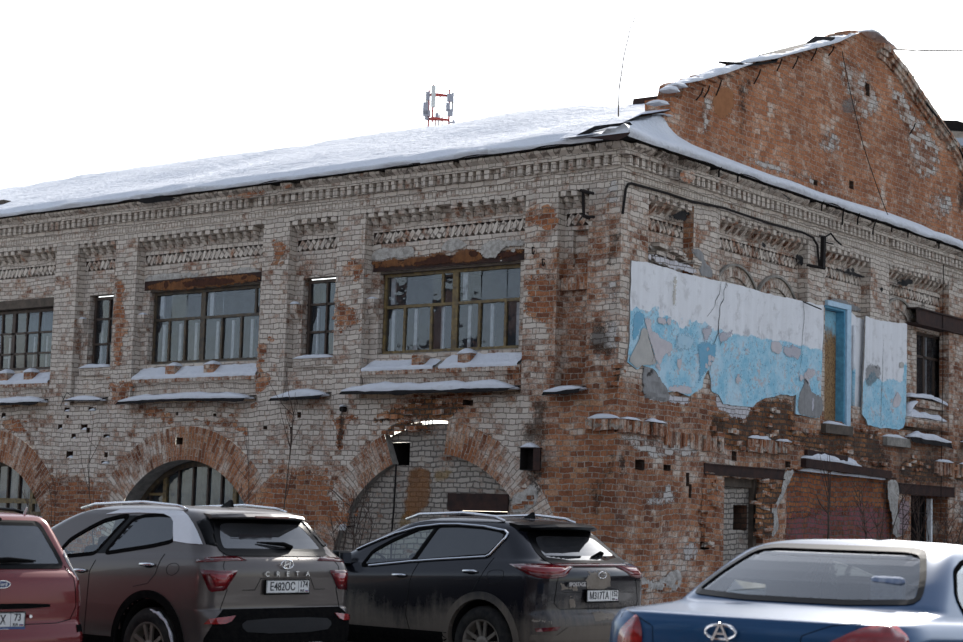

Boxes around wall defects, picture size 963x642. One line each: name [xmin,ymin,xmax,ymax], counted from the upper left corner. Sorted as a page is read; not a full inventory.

peeling [145,262,259,281]
corrosion [147,274,260,291]
peeling [271,239,290,266]
peeling [331,246,414,333]
corrosion [372,249,487,268]
corrosion [498,249,524,259]
peeling [109,275,130,366]
spalling [607,311,733,404]
peeling [106,377,135,402]
spalling [710,368,963,485]
spalling [635,459,645,471]
spalling [686,471,723,550]